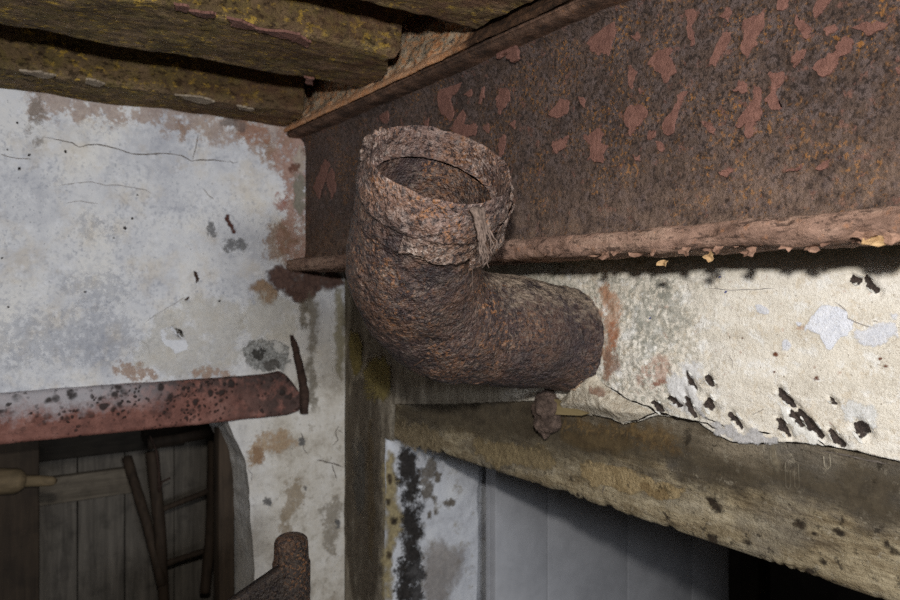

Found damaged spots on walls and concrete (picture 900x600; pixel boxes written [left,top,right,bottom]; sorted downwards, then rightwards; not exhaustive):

crack [45,136,236,163]
rust [357,126,390,180]
crack [64,181,149,204]
damp [263,223,298,264]
damp [251,279,278,304]
spalling [850,274,880,294]
peeling [796,305,898,350]
rust [113,362,157,381]
crack [604,384,875,456]
peeling [651,361,878,447]
damp [393,447,463,600]